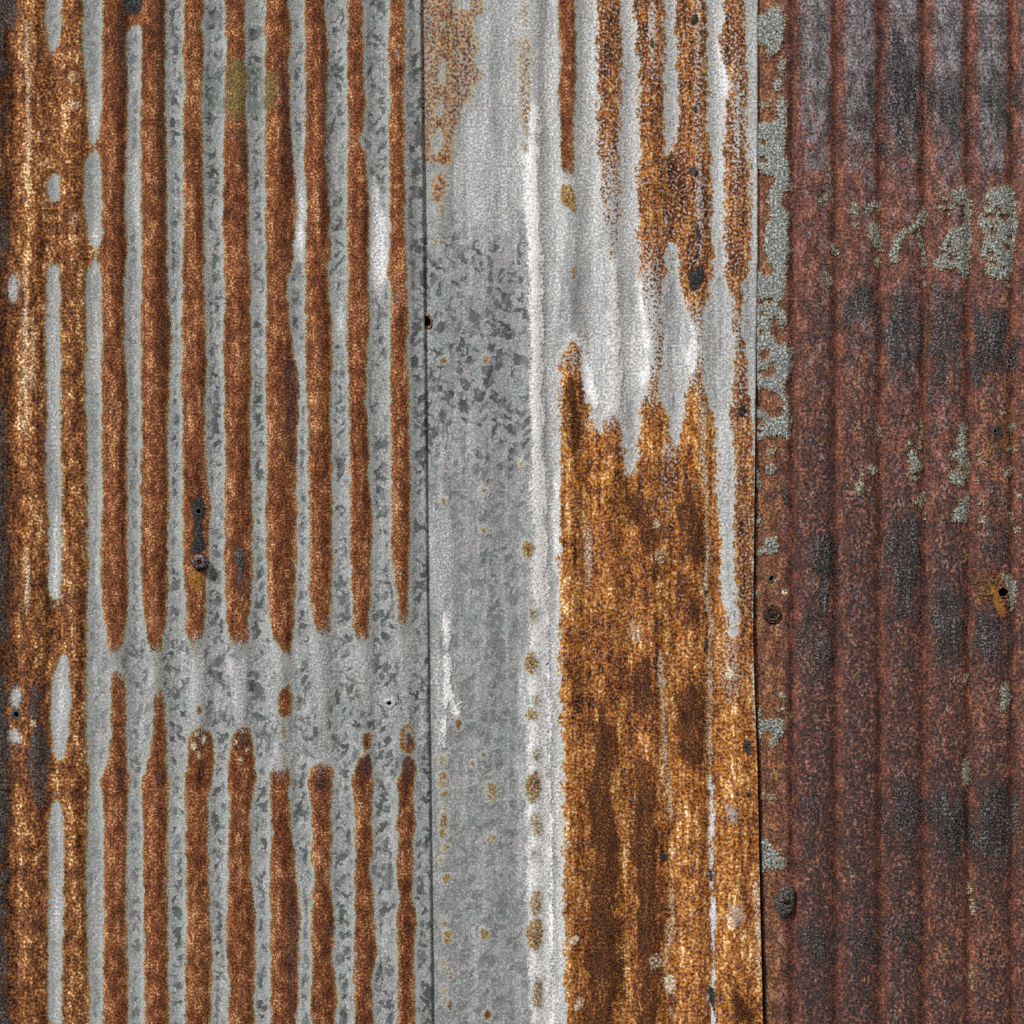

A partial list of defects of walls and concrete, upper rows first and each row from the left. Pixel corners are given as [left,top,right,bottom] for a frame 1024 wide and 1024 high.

peeling [755,3,794,489]
rust [0,0,487,1024]
rust [520,0,763,1024]
peeling [756,516,780,556]
rust [972,571,1012,618]
rust [774,885,796,919]